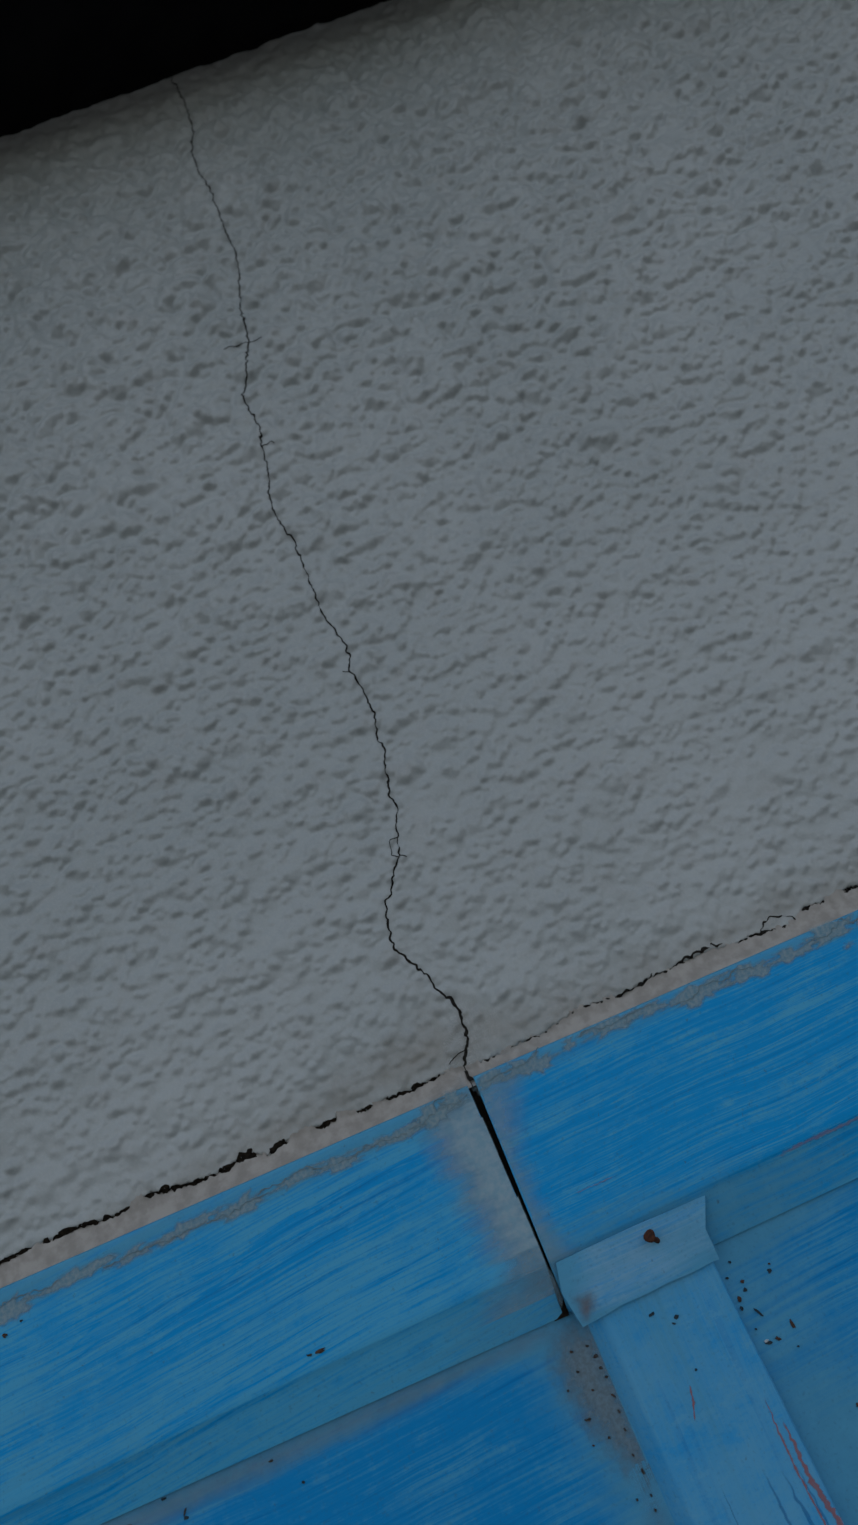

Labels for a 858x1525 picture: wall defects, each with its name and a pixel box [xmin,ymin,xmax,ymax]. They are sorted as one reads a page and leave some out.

crack [0,79,858,1264]